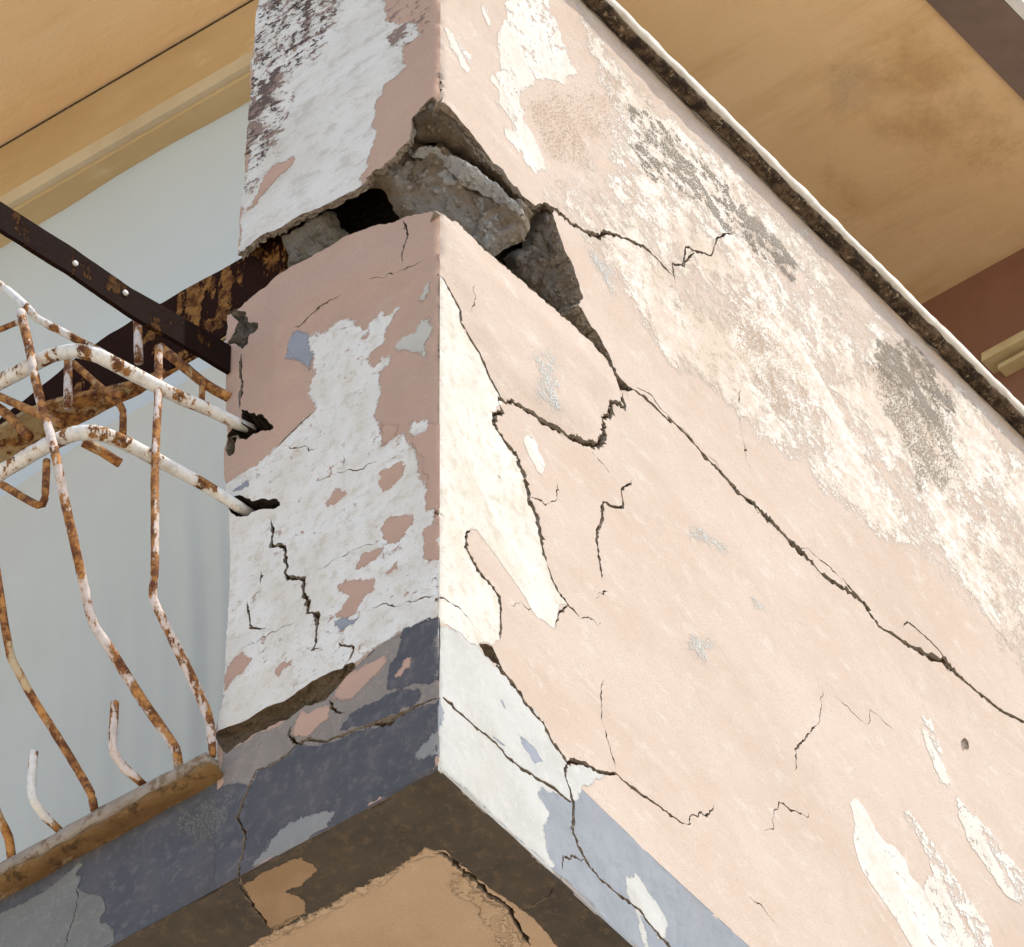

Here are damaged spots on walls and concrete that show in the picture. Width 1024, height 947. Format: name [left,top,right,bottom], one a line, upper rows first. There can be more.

crack [540,204,731,283]
damp [628,103,798,282]
peeling [238,0,1024,675]
crack [369,221,1024,723]
damp [728,292,813,425]
damp [865,338,963,508]
crack [247,520,370,667]
peeling [216,276,608,874]
peeling [243,810,439,947]
crack [236,664,714,947]
peeling [849,798,994,947]
peeling [956,797,1024,903]